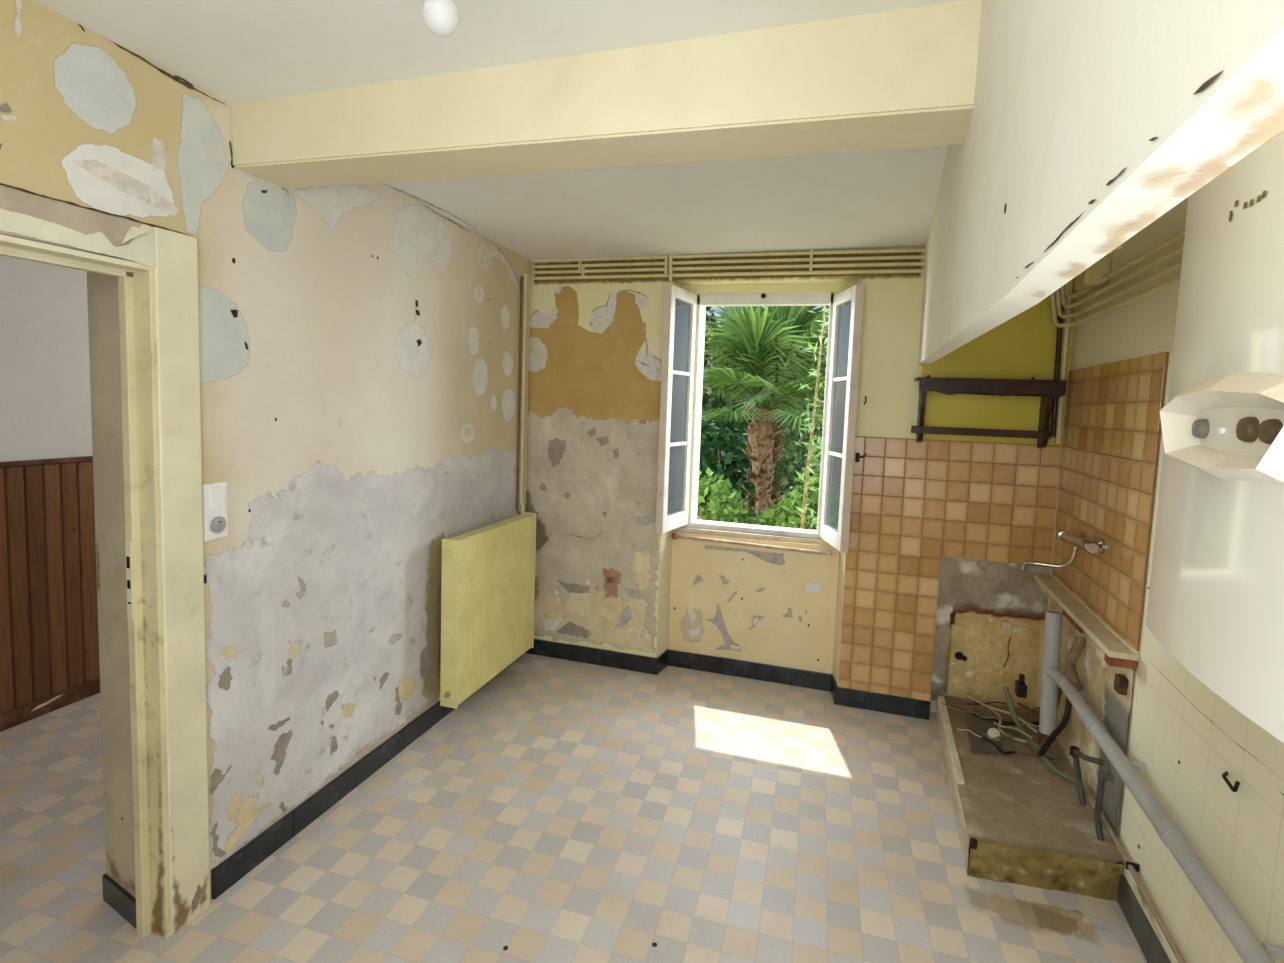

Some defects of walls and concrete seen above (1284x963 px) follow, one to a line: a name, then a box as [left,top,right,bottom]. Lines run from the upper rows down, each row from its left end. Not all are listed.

spalling [0,102,16,121]
peeling [152,137,166,170]
peeling [73,159,179,216]
peeling [0,208,156,268]
peeling [203,286,662,870]
peeling [704,545,786,573]
peeling [687,575,741,652]
spalling [930,557,1139,846]
crack [1155,667,1284,796]